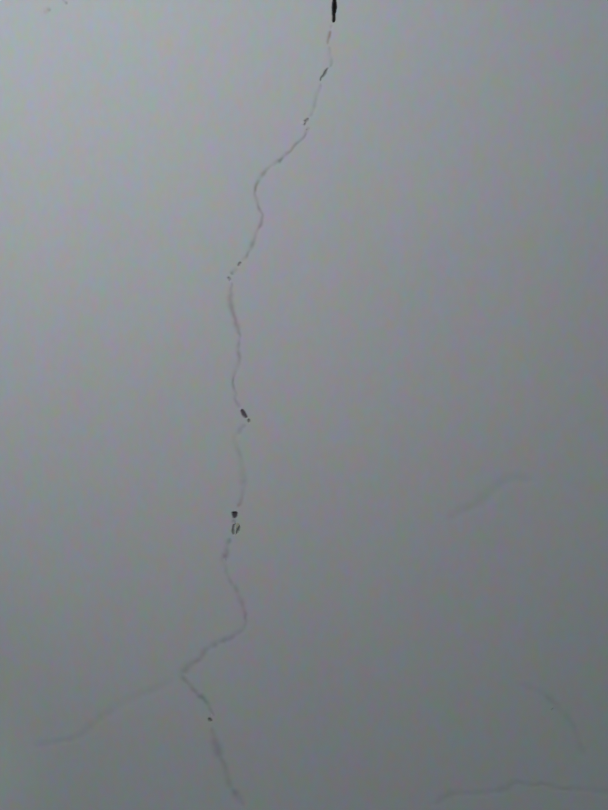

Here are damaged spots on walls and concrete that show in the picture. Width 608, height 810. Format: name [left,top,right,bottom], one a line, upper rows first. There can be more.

crack [30,0,338,809]